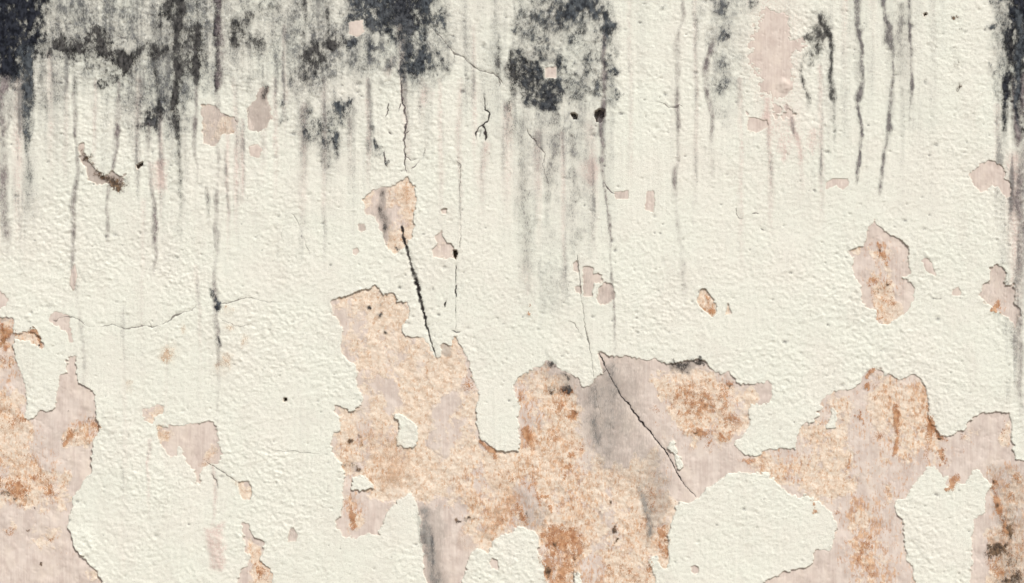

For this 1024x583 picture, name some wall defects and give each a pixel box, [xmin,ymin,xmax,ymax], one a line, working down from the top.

water stain [0,0,452,212]
peeling [201,86,273,157]
water stain [495,0,620,199]
water stain [801,13,837,103]
water stain [854,0,864,137]
water stain [989,0,1024,145]
peeling [358,177,417,254]
crack [401,226,461,356]
peeling [849,219,915,324]
peeling [0,291,103,583]
crack [573,322,695,495]
peeling [331,285,1024,583]